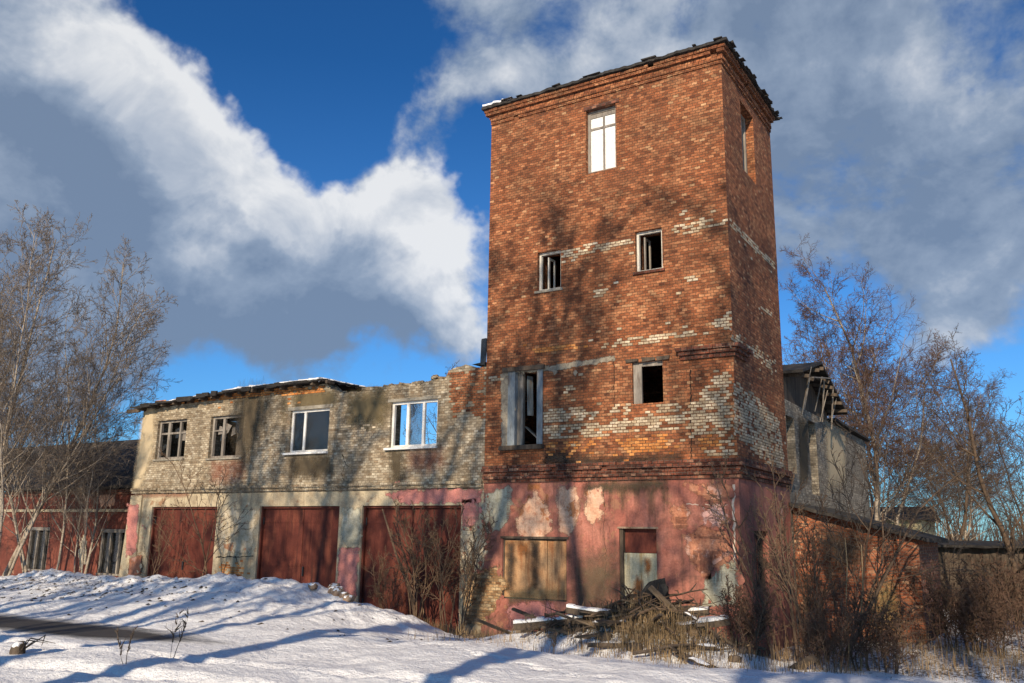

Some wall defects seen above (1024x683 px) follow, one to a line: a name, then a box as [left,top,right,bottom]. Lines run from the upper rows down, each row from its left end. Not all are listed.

peeling [99,494,146,575]
flaking render [385,481,605,628]
flaking render [669,478,749,607]